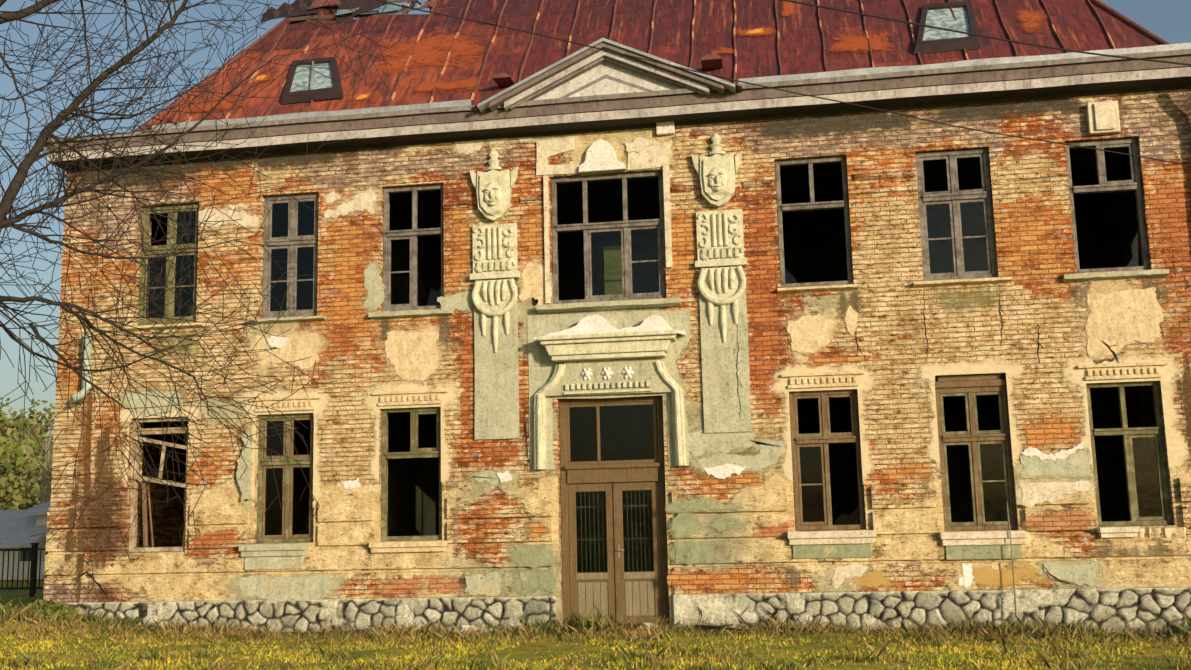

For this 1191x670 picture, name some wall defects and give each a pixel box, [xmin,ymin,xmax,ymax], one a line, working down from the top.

corrosion [781,0,796,16]
corrosion [736,27,775,36]
corrosion [830,31,892,52]
corrosion [1017,11,1045,32]
corrosion [376,29,484,92]
corrosion [190,100,235,112]
corrosion [345,92,377,104]
flaking render [620,137,651,153]
water stain [1176,355,1191,454]
flaking render [1015,413,1096,537]
flaking render [665,429,795,595]
water stain [1103,543,1181,564]